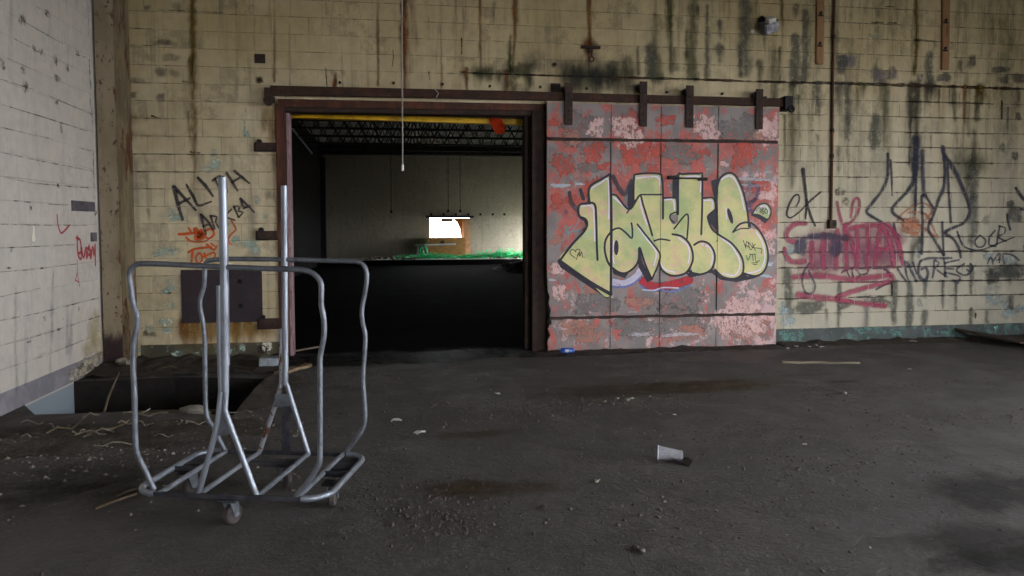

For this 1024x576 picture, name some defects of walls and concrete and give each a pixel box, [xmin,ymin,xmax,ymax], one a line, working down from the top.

leakage [477,42,532,91]
corrosion [583,0,594,59]
leakage [562,59,633,89]
leakage [647,0,673,79]
leakage [687,6,723,79]
leakage [772,5,820,144]
leakage [836,55,855,132]
leakage [862,68,896,149]
leakage [907,52,976,172]
leakage [993,67,1024,129]